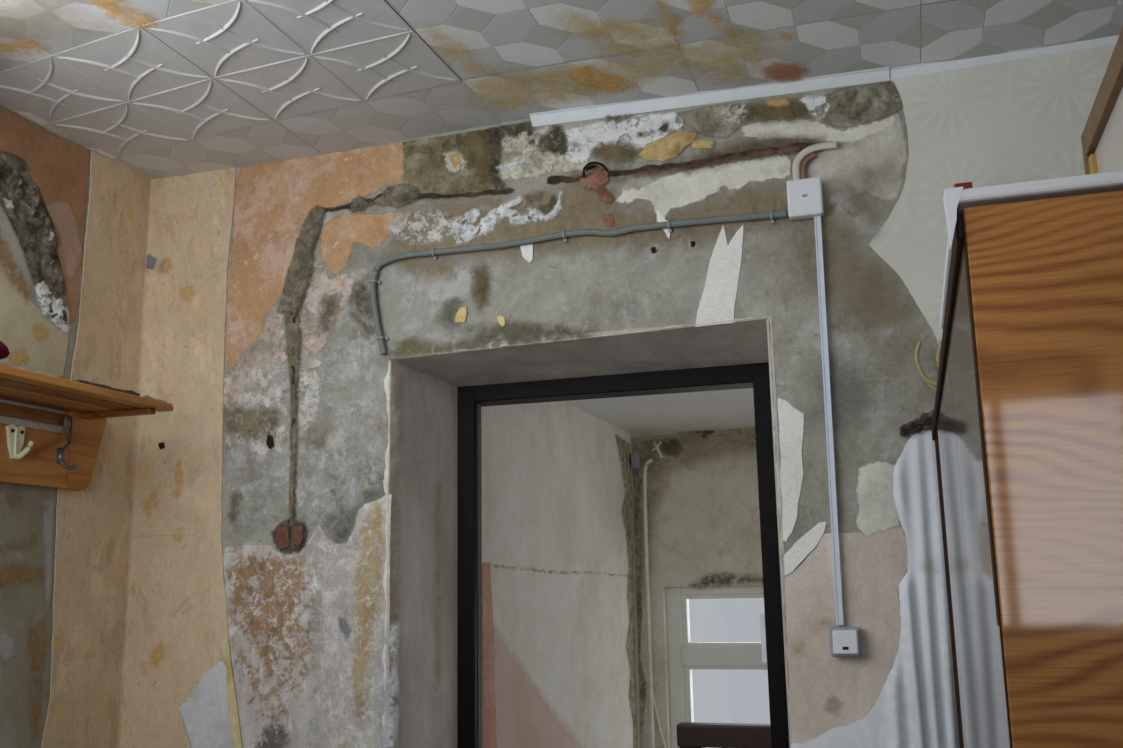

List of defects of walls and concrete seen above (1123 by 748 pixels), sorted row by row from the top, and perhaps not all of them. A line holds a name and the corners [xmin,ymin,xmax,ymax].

leakage [89,0,155,28]
leakage [477,19,805,107]
flaking render [821,81,902,128]
peeling [496,126,553,171]
flaking render [638,131,713,161]
peeling [0,106,90,333]
peeling [452,190,563,244]
flaking render [580,164,615,227]
peeling [225,142,413,370]
peeling [455,307,467,322]
peeling [223,317,793,748]
corrosion [229,556,309,719]